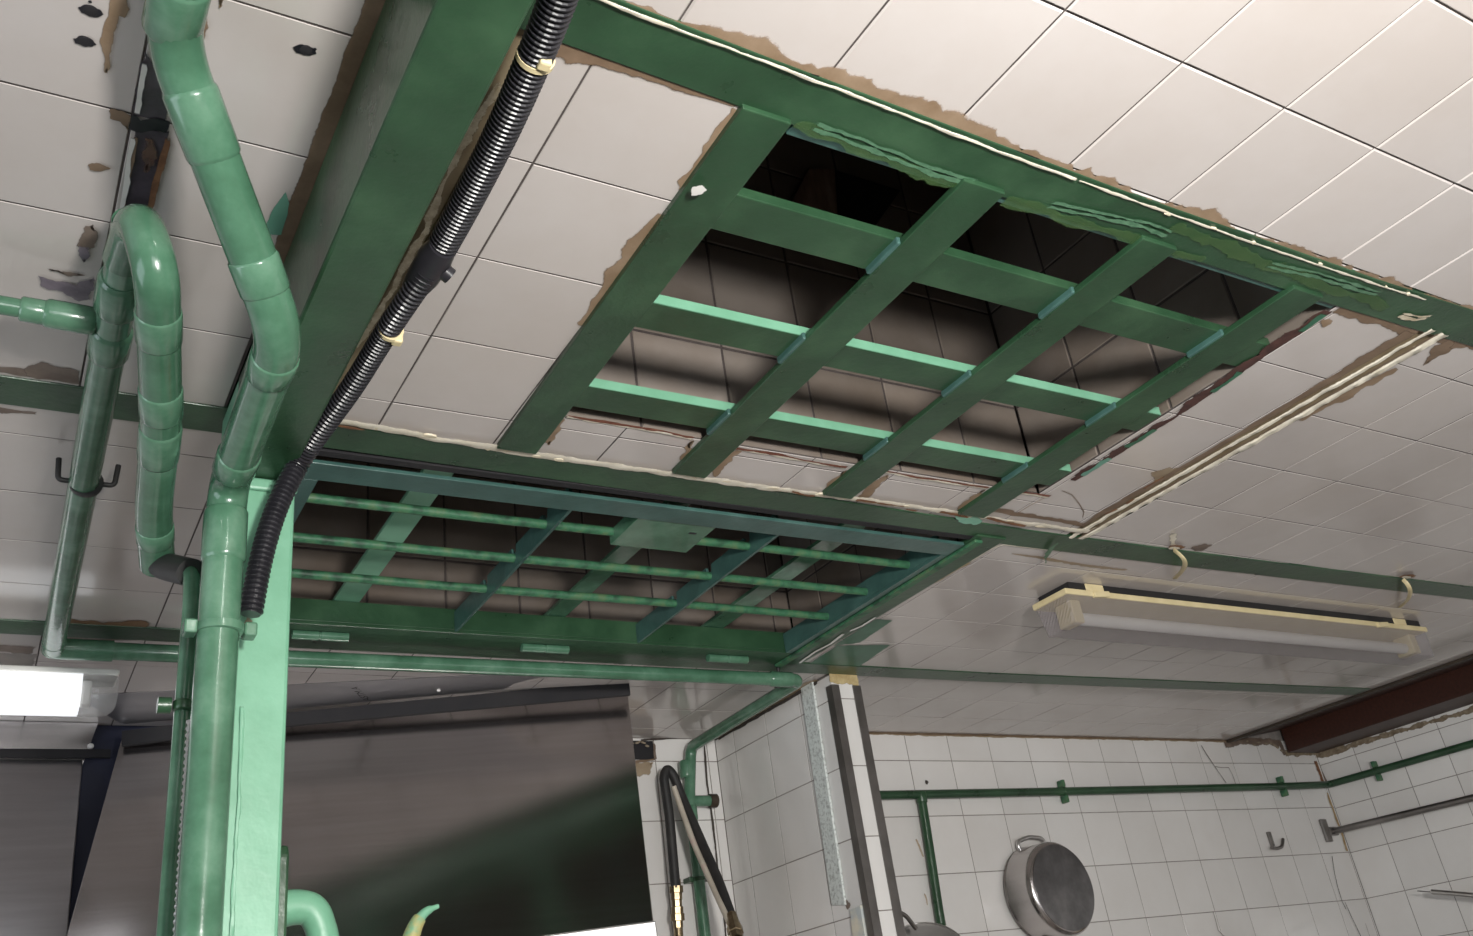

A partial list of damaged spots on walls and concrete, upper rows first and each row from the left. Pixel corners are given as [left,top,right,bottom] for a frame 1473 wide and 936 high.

peeling [340,0,1449,540]
spalling [1224,706,1473,758]